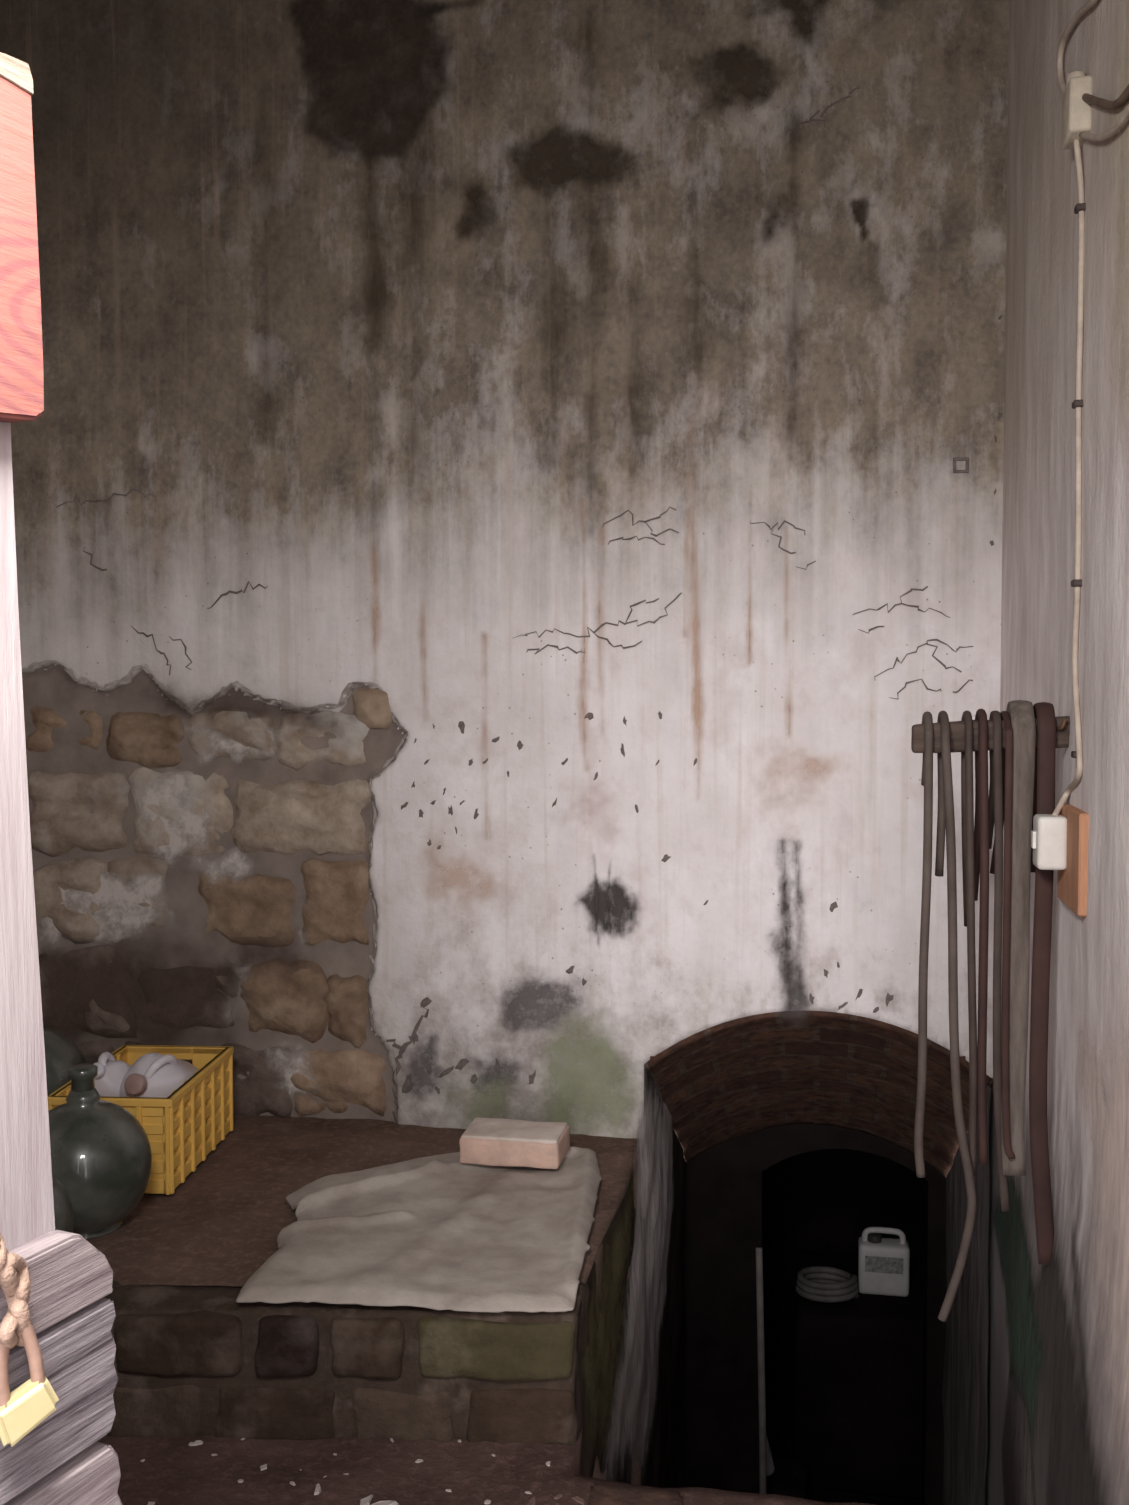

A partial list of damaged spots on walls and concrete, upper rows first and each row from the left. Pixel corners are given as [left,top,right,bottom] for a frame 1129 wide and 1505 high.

water stain [712,45,776,108]
water stain [291,0,450,240]
water stain [511,127,634,194]
crack [602,506,679,545]
crack [750,520,816,570]
crack [130,625,192,675]
crack [512,593,682,654]
crack [853,586,973,700]
spalling [22,660,479,1123]
water stain [580,879,637,935]
water stain [775,872,809,1013]
water stain [503,981,576,1029]